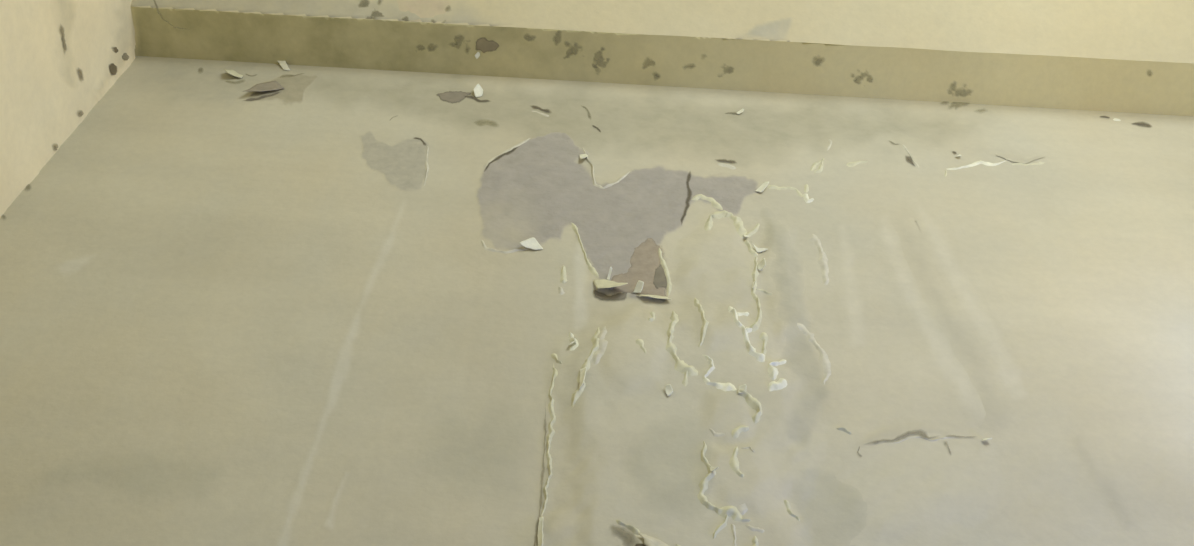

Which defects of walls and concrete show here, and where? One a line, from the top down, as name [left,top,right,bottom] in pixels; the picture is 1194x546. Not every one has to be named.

peeling [224,61,319,107]
peeling [437,84,489,103]
peeling [358,130,431,193]
water stain [567,238,593,334]
peeling [474,132,832,546]
water stain [760,207,868,546]
water stain [873,208,1016,438]